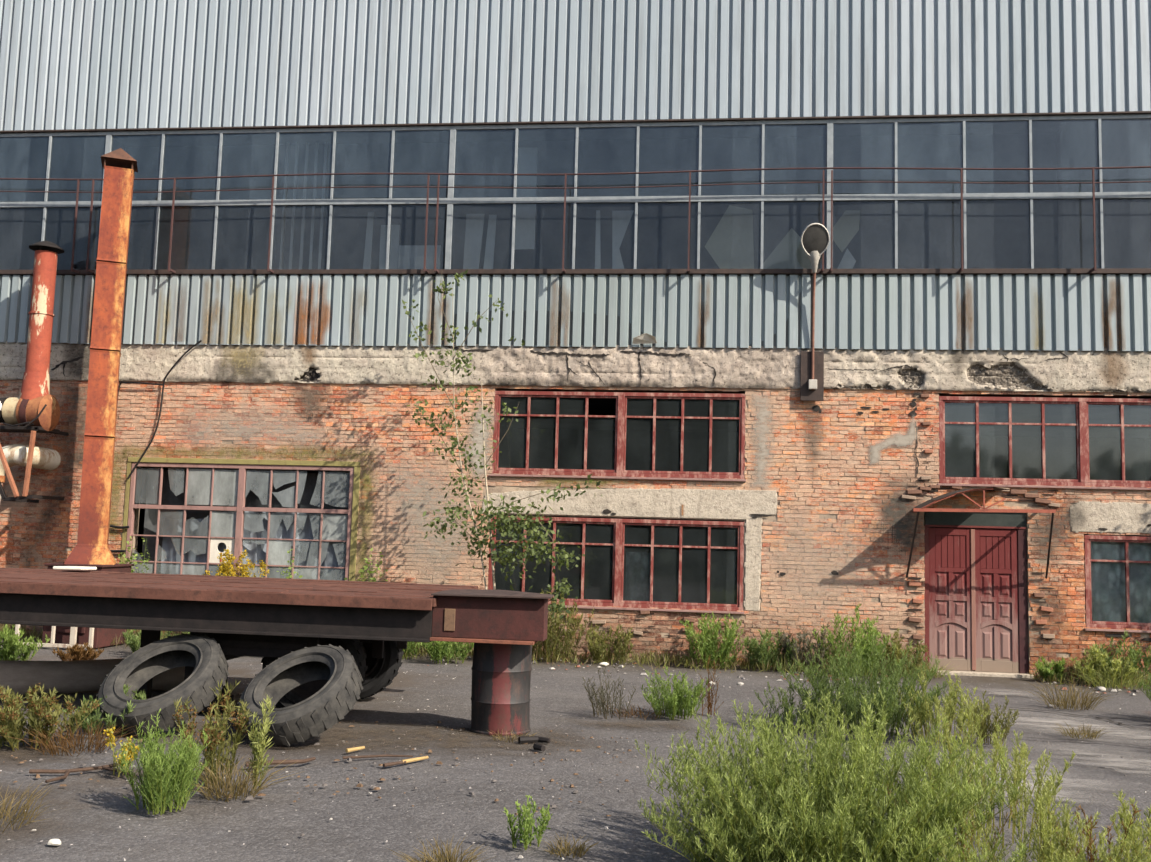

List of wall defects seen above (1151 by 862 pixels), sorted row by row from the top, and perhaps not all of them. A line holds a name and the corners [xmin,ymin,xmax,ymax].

corrosion [296,288,329,345]
corrosion [957,294,973,350]
corrosion [1103,283,1124,351]
spalling [295,367,323,382]
crack [530,350,716,386]
spalling [967,363,1056,391]
spalling [834,365,962,502]